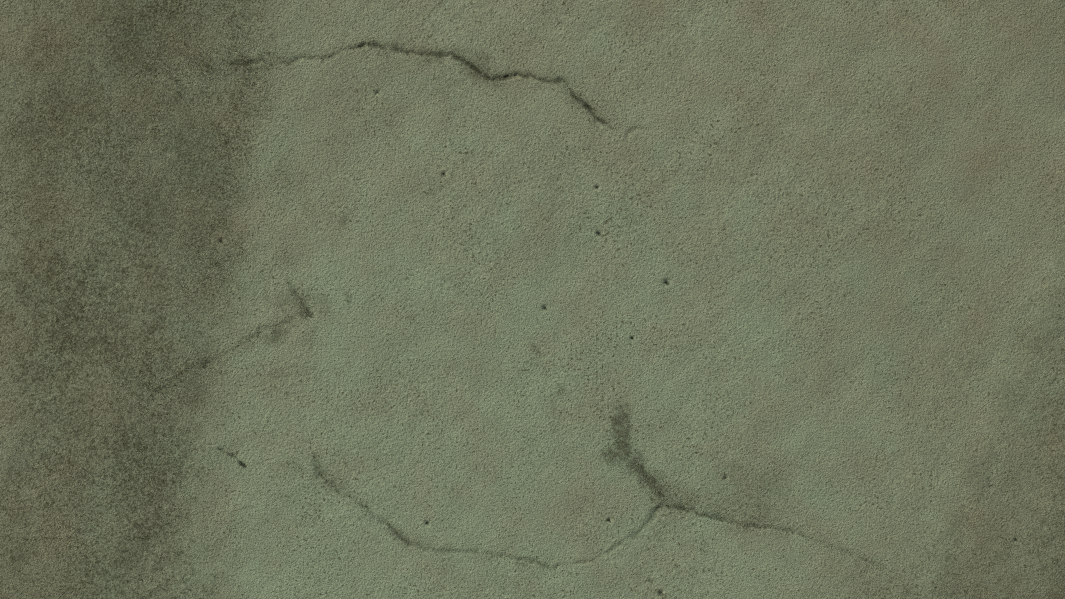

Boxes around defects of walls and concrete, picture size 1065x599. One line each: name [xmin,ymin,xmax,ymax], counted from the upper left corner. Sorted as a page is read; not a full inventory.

crack [439,55,527,80]